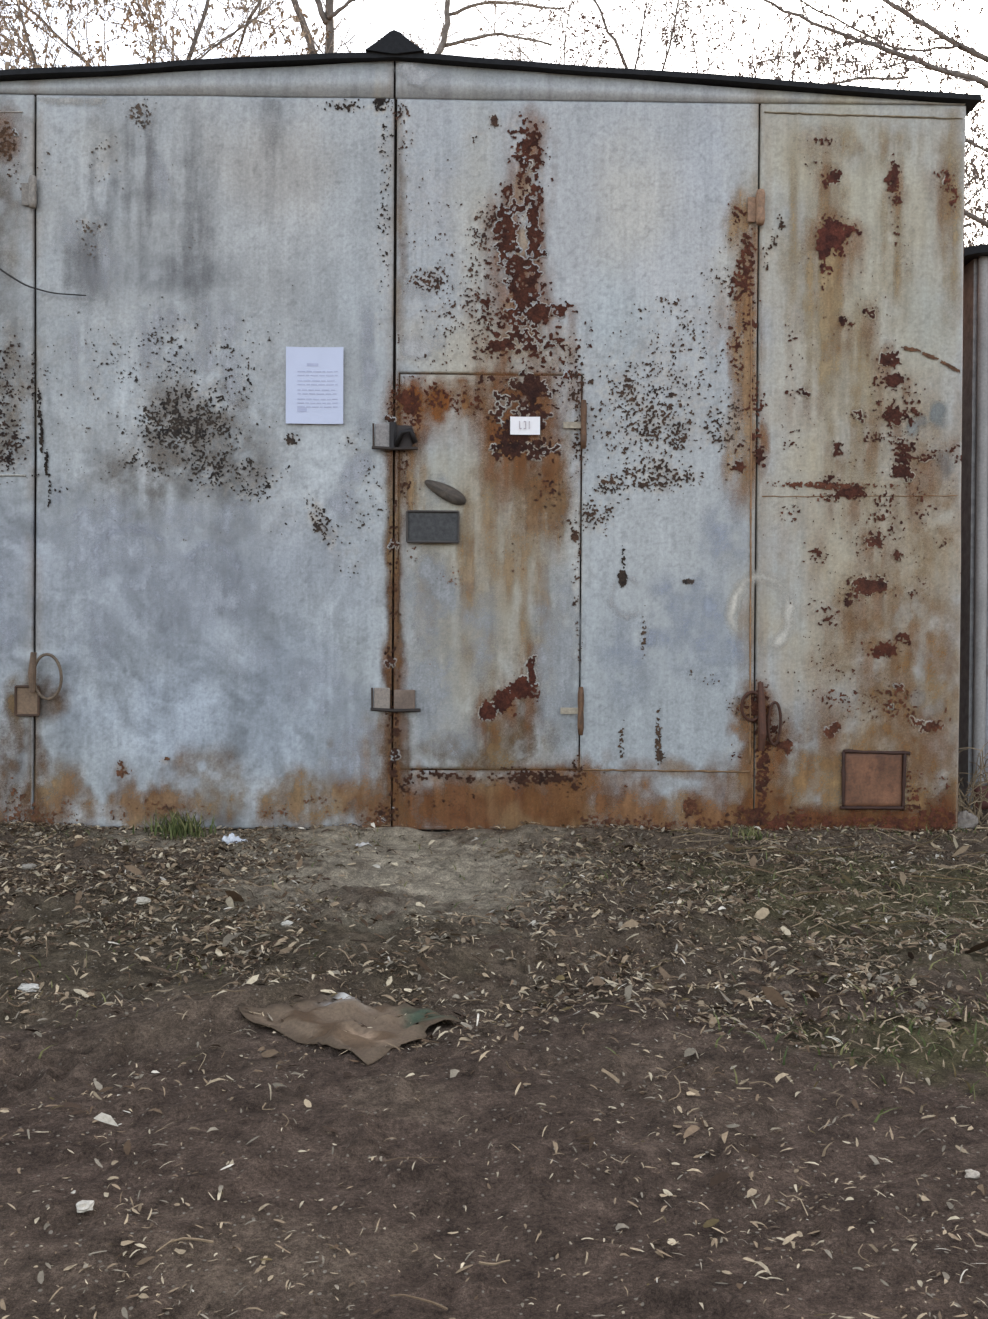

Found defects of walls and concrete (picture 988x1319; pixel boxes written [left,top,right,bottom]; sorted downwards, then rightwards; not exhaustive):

damp [147,385,242,473]
corrosion [0,98,962,831]